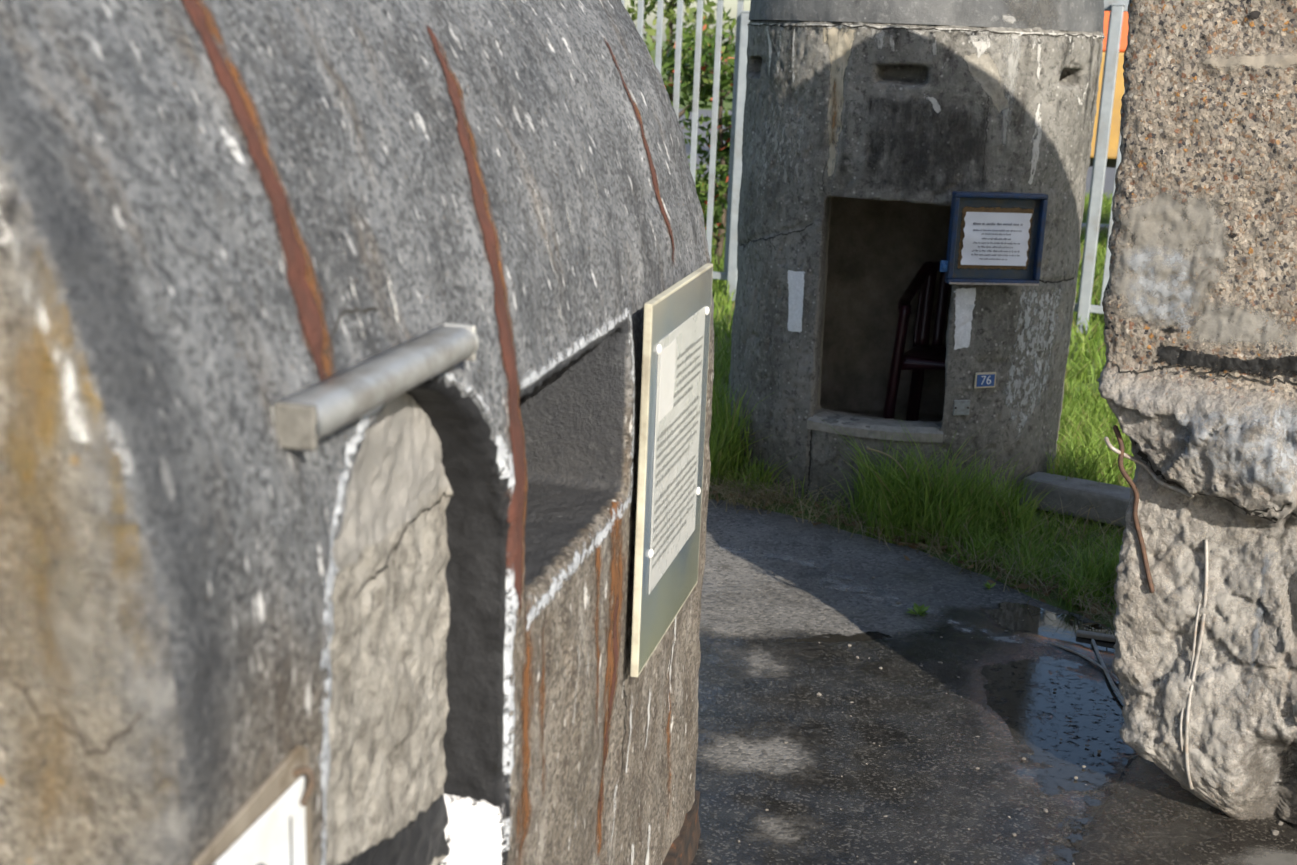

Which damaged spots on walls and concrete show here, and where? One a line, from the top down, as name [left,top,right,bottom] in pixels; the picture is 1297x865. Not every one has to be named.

rust [183,0,332,381]
rust [426,25,528,612]
crack [4,670,142,756]